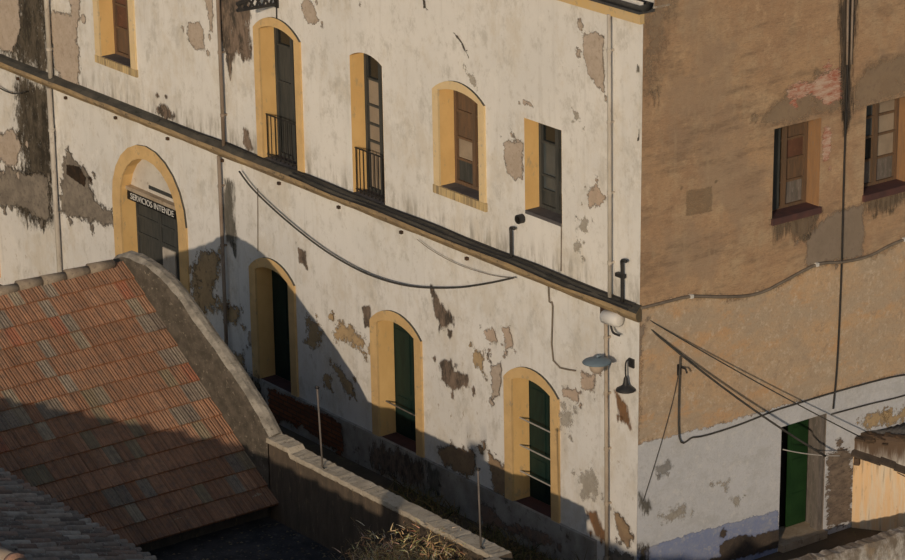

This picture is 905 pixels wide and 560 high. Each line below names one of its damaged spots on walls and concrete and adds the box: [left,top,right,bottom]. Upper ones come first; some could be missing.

flaking render [0,0,21,54]
damp [2,0,54,72]
flaking render [50,0,86,85]
damp [220,0,252,80]
flaking render [576,18,607,101]
spalling [786,59,844,109]
damp [838,0,858,135]
damp [14,76,56,233]
flaking render [503,131,524,181]
flaking render [304,306,371,362]
flaking render [433,326,516,408]
flaking render [437,440,505,497]